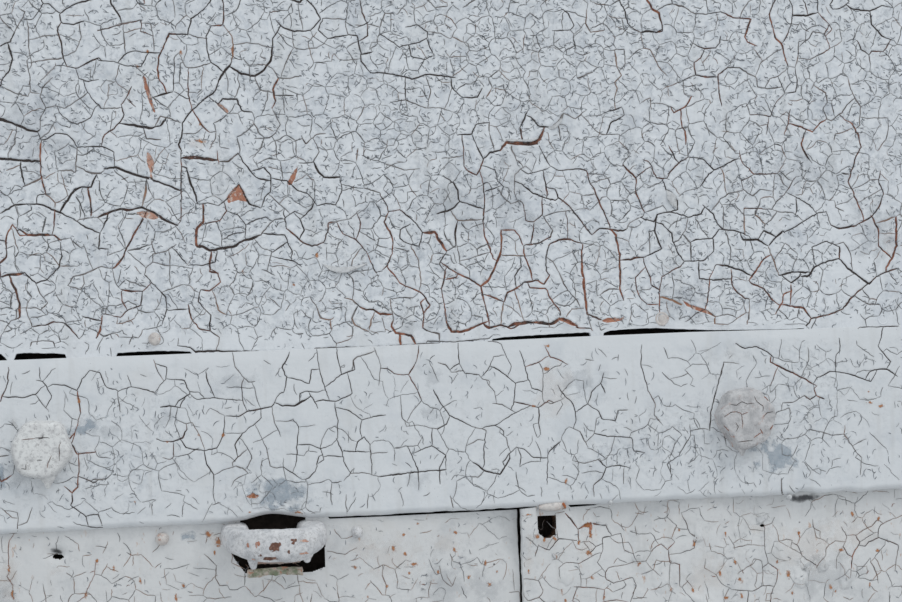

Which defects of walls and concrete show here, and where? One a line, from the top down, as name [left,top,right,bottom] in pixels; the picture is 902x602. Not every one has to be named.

peeling [227,185,247,203]
crack [662,340,721,387]
crack [726,398,770,431]
crack [739,429,799,508]
crack [0,501,514,602]
crack [704,490,902,602]